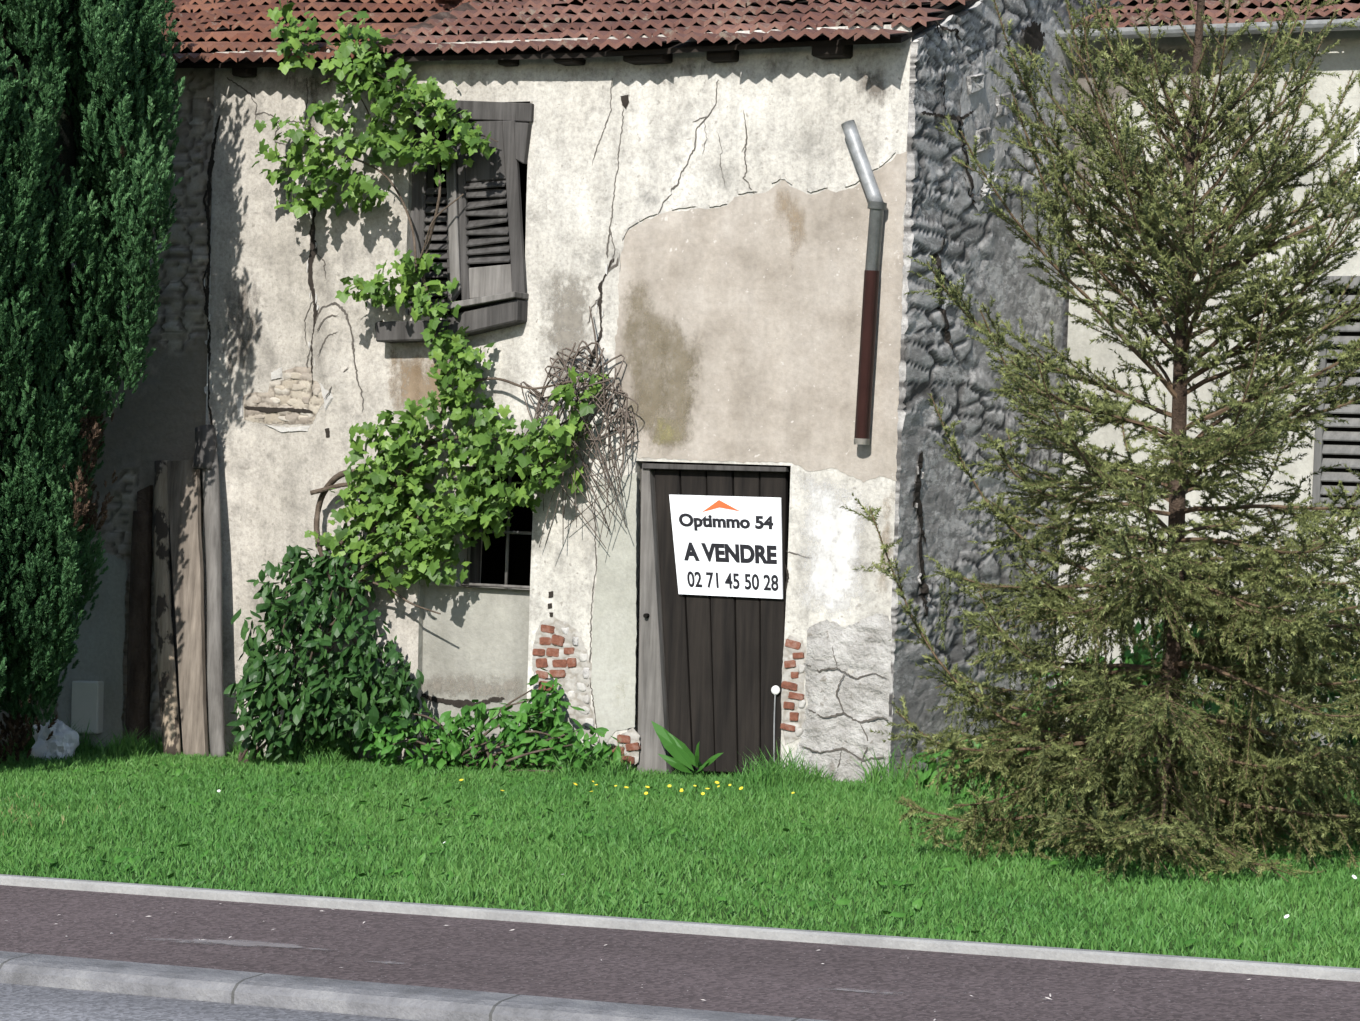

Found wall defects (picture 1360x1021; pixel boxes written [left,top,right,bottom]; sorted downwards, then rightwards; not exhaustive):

crack [227,77,323,144]
crack [658,81,755,215]
crack [202,115,220,425]
crack [304,208,326,396]
crack [582,82,624,387]
flaking render [615,150,907,482]
spalling [236,366,333,438]
crack [913,450,931,616]
spalling [532,591,595,737]
spalling [611,728,641,769]
spalling [780,613,895,783]